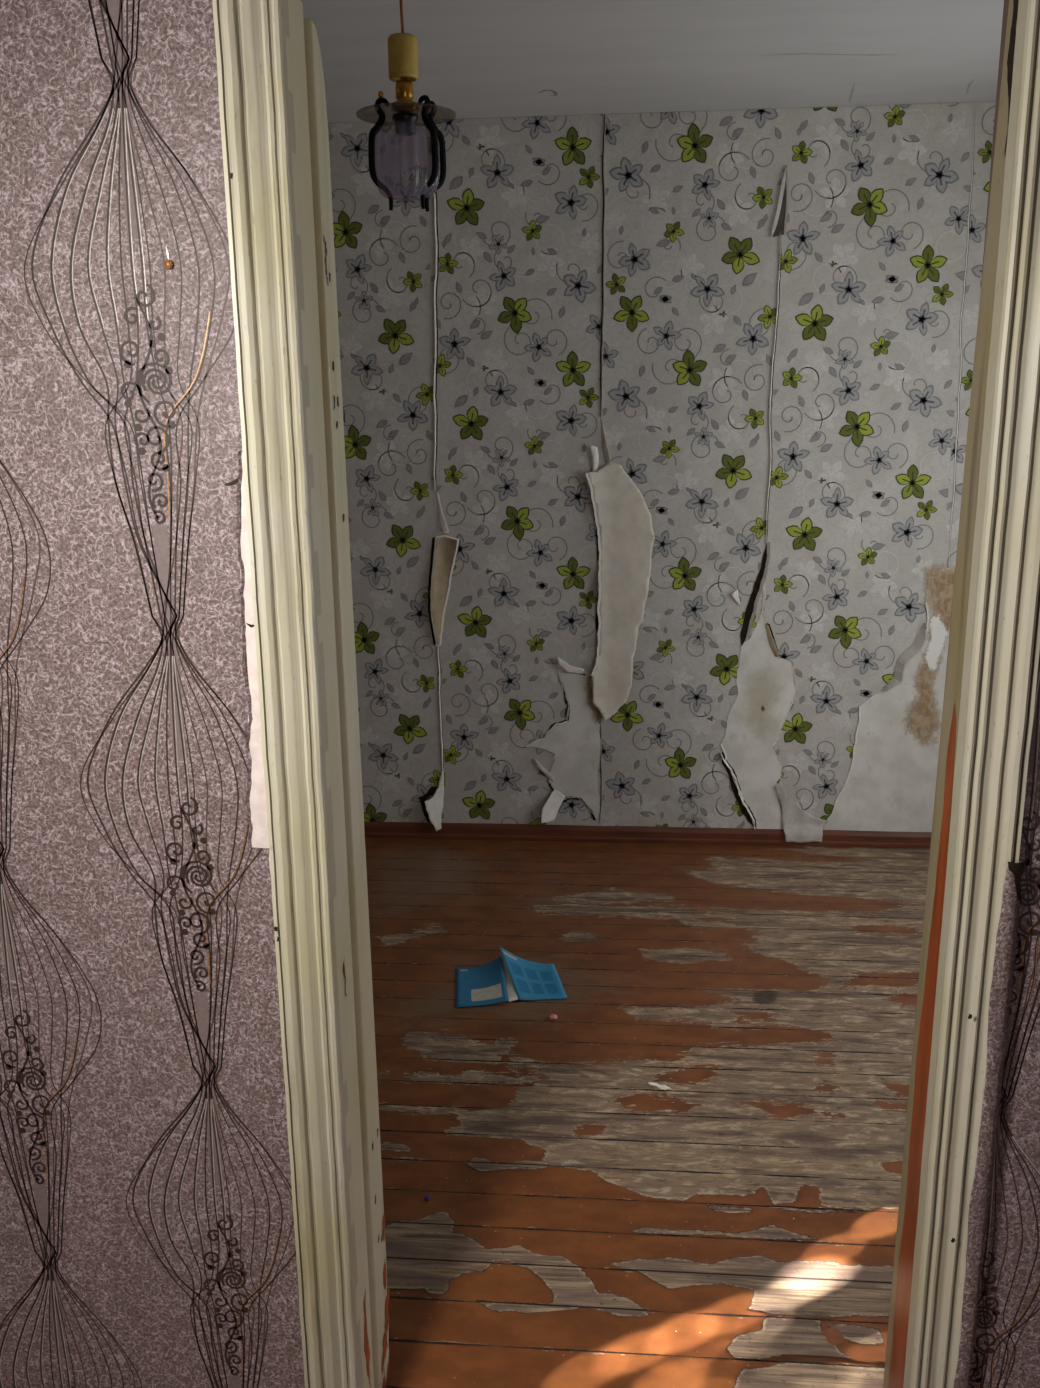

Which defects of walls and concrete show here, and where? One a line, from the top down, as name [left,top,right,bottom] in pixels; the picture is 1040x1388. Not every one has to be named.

peeling [529,418,655,820]
flaking render [722,565,795,829]
flaking render [823,567,955,832]
peeling [363,1211,649,1387]
peeling [466,1157,549,1172]
peeling [610,1204,893,1388]